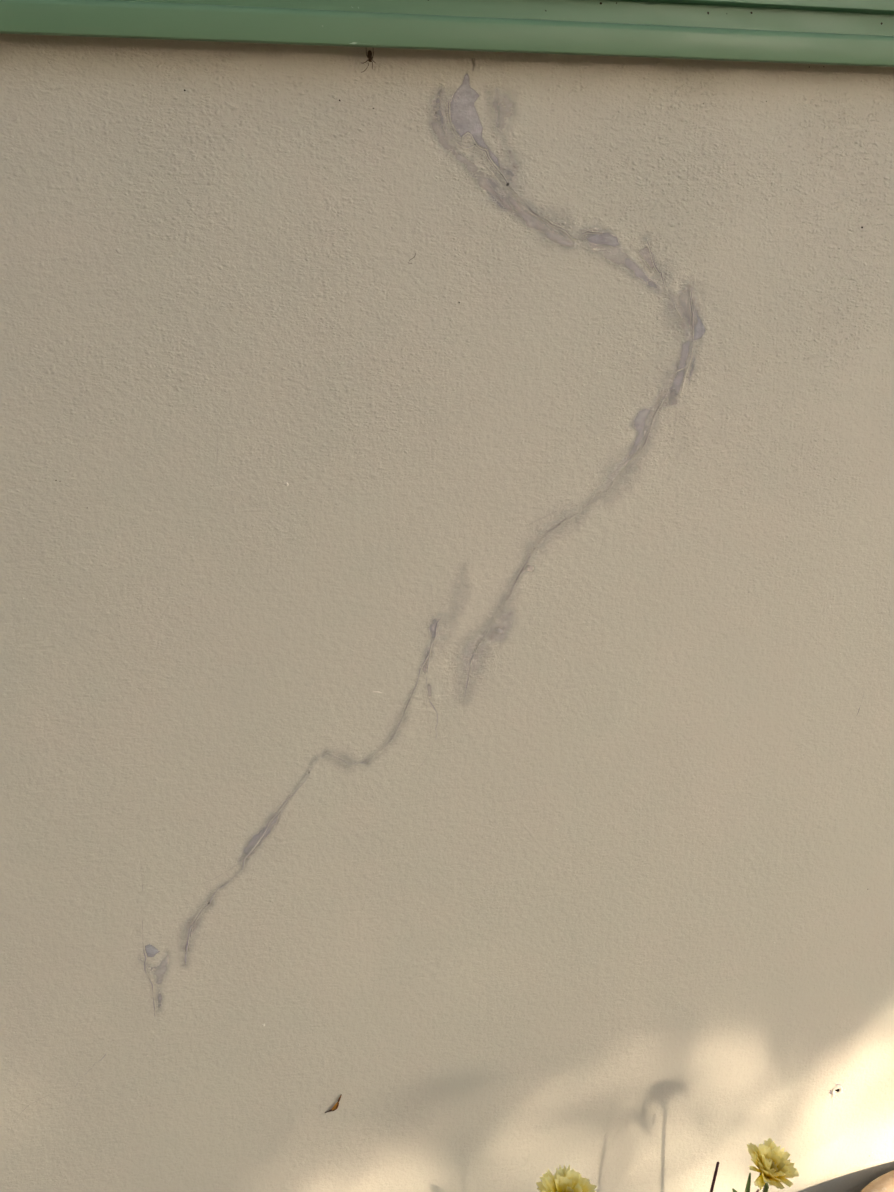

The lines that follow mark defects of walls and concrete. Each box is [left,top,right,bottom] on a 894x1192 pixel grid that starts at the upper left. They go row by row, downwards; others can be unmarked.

crack [447,102,694,697]
crack [185,584,441,965]